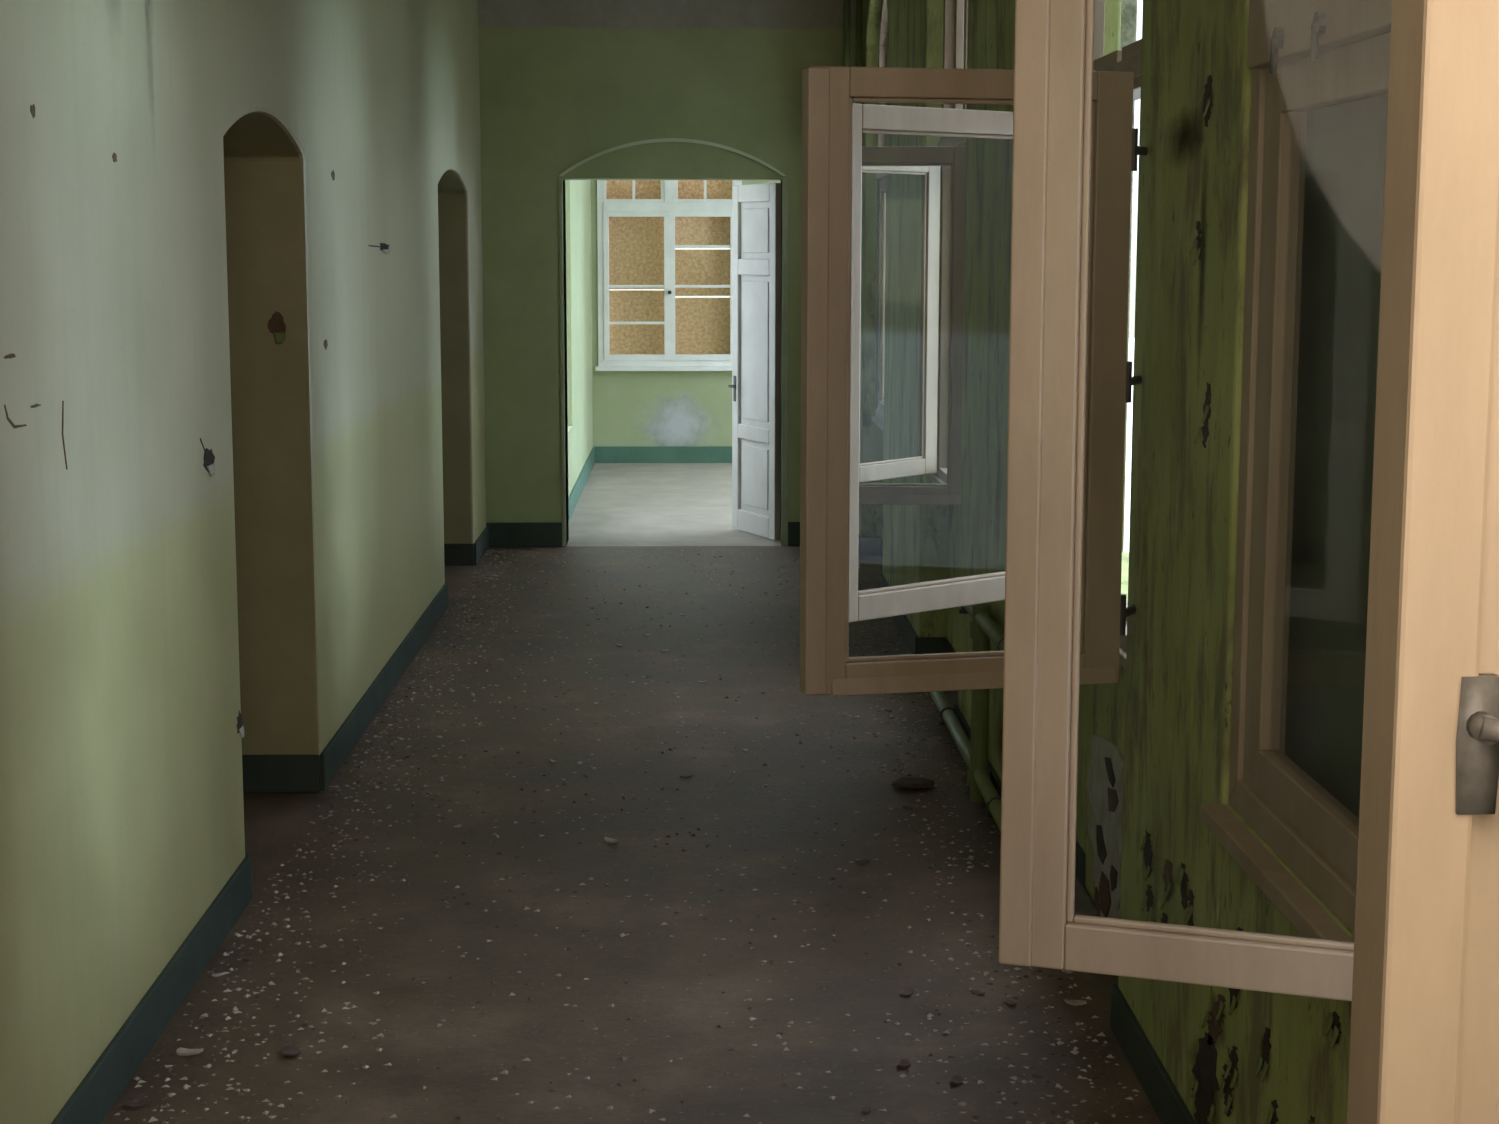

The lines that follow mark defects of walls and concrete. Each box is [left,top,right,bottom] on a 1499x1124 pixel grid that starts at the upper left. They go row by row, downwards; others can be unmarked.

flaking render [651,401,700,446]